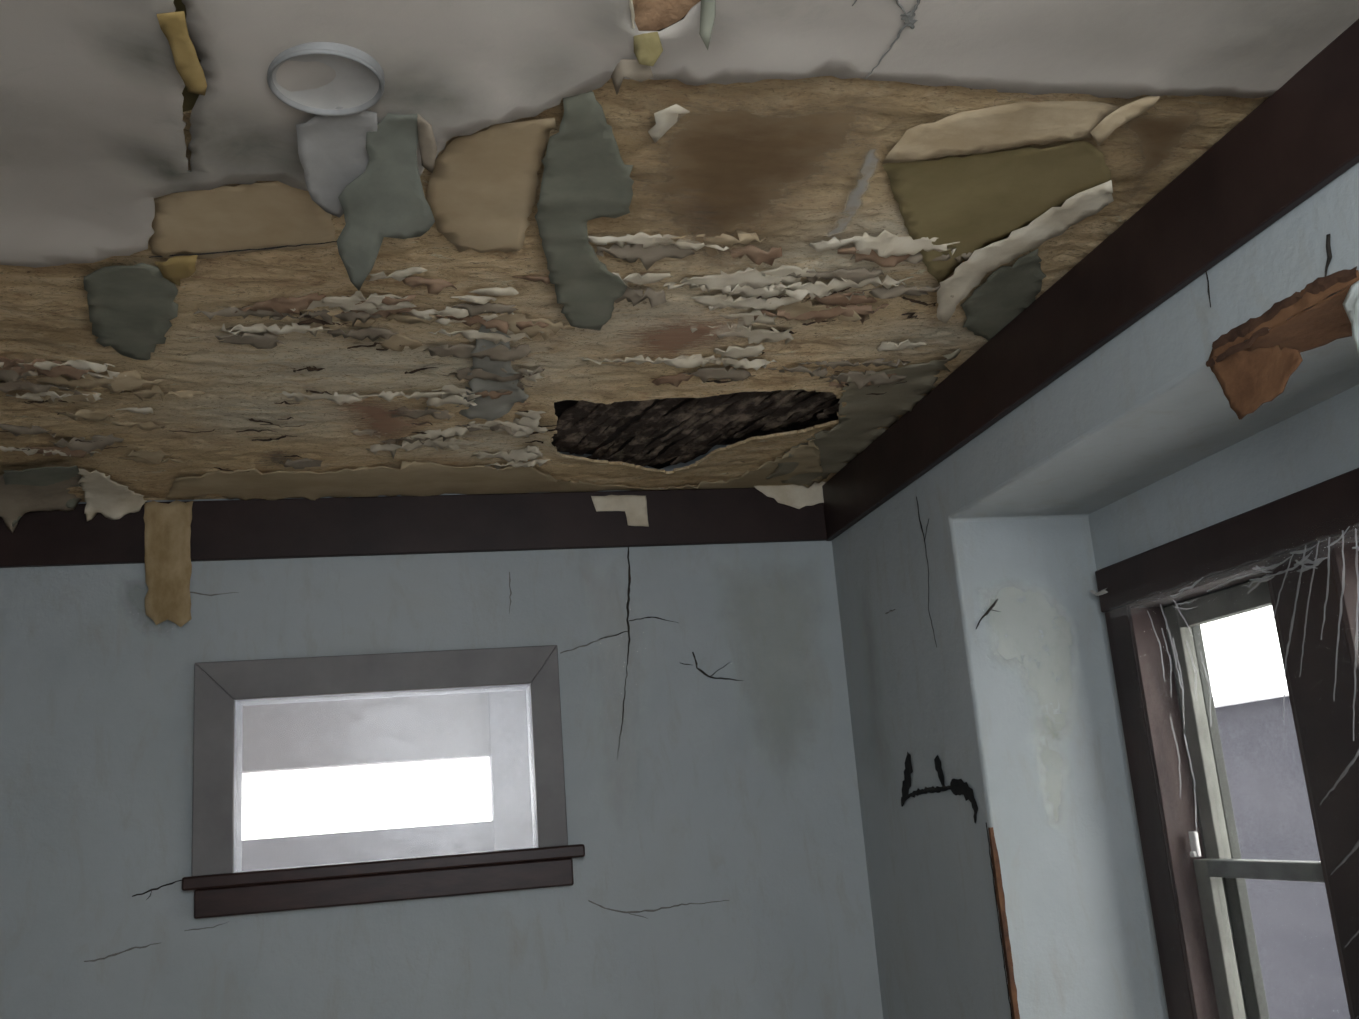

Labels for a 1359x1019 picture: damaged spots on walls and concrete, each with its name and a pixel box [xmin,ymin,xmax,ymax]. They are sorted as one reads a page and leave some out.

crack [864,0,920,80]
leakage [645,106,861,258]
peeling [0,76,1268,502]
spalling [1206,266,1359,420]
crack [560,547,678,758]
crack [681,652,743,681]
crack [588,900,729,919]